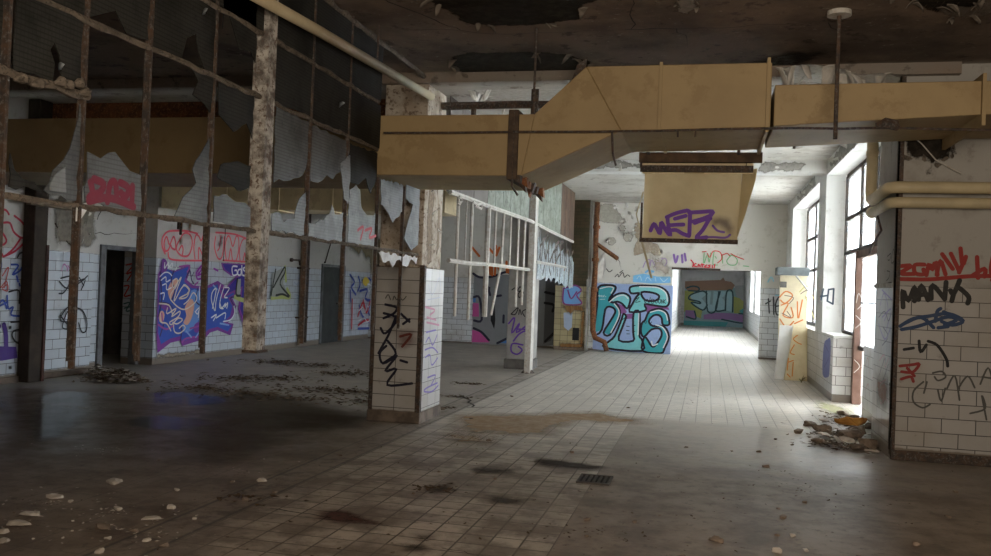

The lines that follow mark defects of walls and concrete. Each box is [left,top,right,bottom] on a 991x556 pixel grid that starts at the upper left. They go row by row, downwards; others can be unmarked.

peeling [55,196,97,247]
peeling [600,202,663,256]